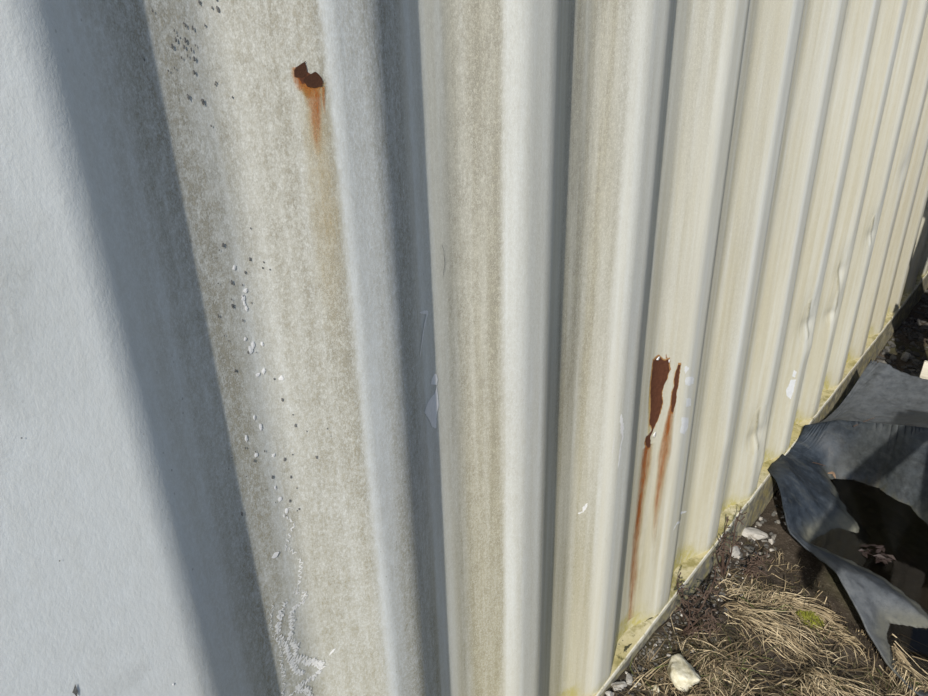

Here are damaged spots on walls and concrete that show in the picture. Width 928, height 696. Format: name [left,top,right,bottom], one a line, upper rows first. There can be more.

water stain [167,22,206,75]
corrosion [293,61,325,124]
corrosion [656,363,681,505]